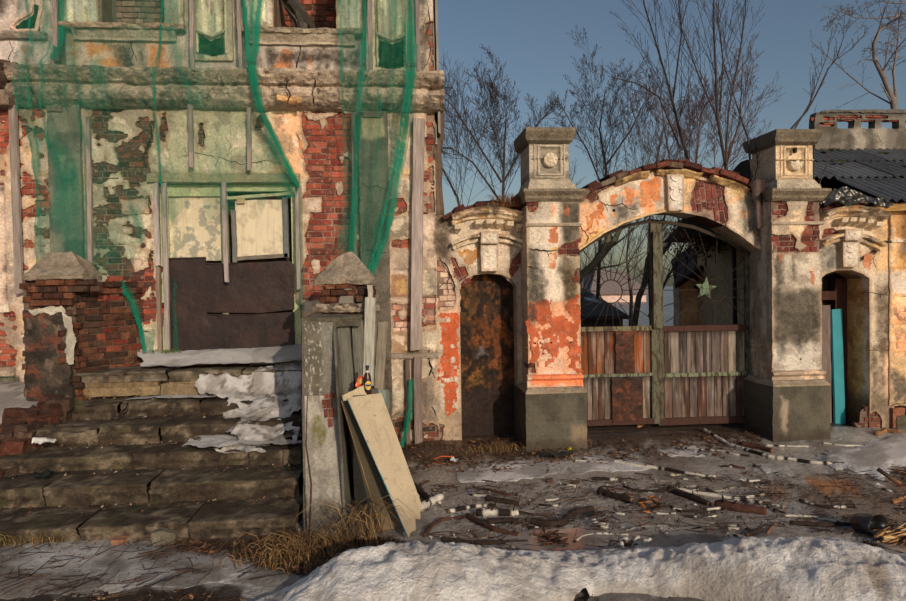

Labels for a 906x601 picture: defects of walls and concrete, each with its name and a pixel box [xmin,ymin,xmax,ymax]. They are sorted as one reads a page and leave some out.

crack [281,46,322,105]
flaking render [0,107,45,185]
flaking render [20,163,50,248]
flaking render [92,109,168,332]
flaking render [296,112,361,305]
peeling [548,168,669,269]
flaking render [690,171,728,228]
flaking render [770,201,837,265]
flaking render [0,311,23,368]
flaking render [28,306,77,365]
peeling [390,247,480,444]
peeling [525,268,583,374]